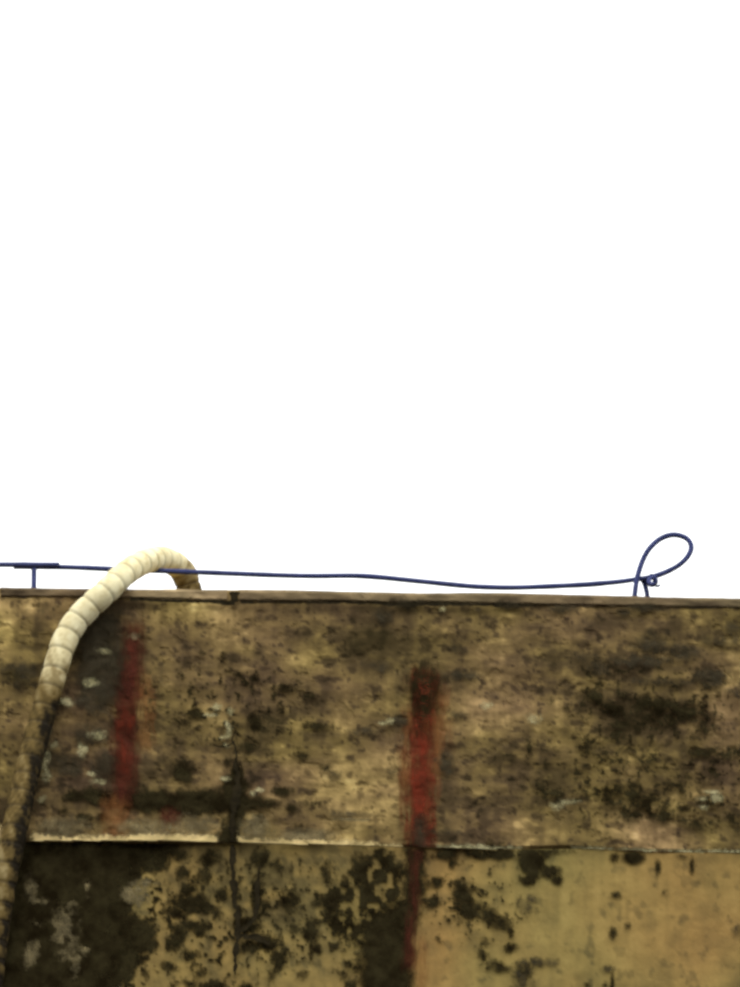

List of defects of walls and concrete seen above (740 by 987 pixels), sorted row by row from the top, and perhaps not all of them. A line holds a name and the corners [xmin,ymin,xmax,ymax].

damp [1,608,575,987]
damp [503,627,740,832]
damp [610,852,661,873]